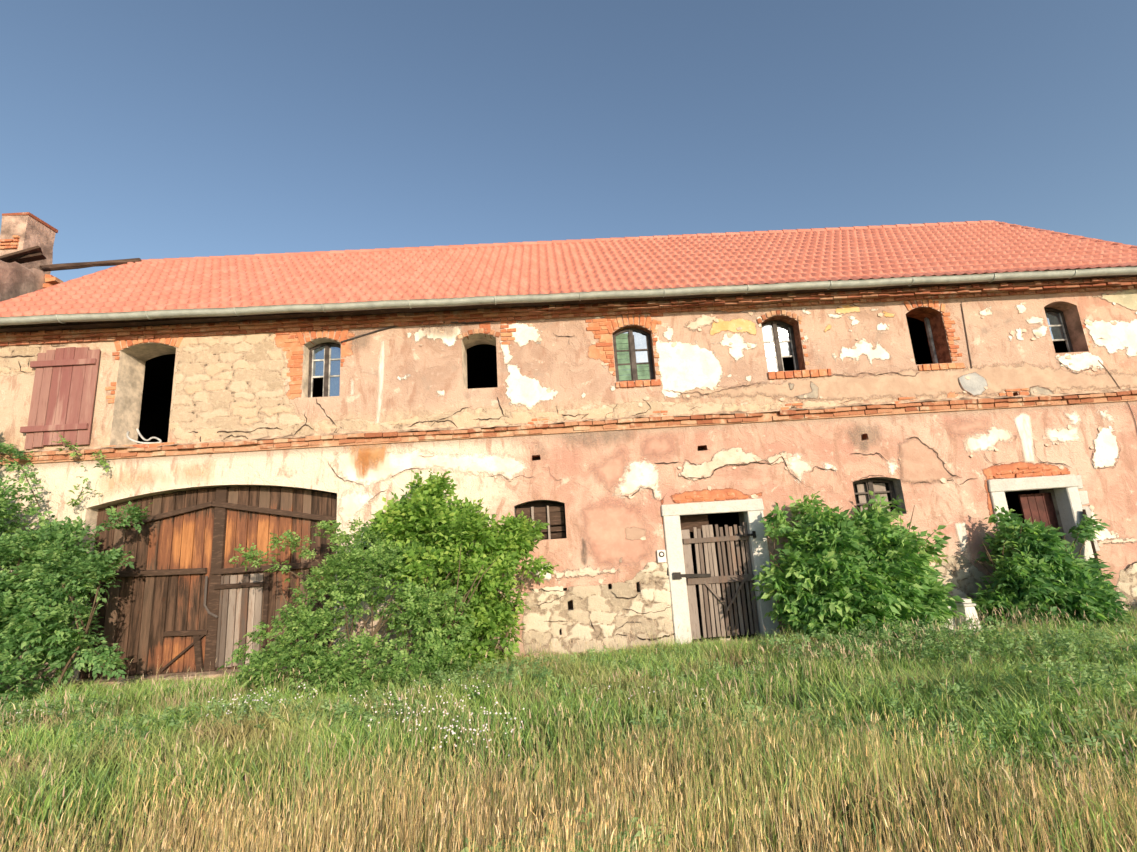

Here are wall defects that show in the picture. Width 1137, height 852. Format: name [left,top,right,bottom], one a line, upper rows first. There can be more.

flaking render [169,289,1137,443]
crack [189,399,337,442]
crack [328,455,434,501]
crack [409,397,505,430]
flaking render [612,447,837,524]
crack [624,452,886,501]
flaking render [964,427,1013,458]
crack [909,436,1121,485]
flaking render [982,461,1069,525]
flaking render [1043,410,1119,469]
flaking render [521,557,675,655]
flaking render [1115,561,1137,612]